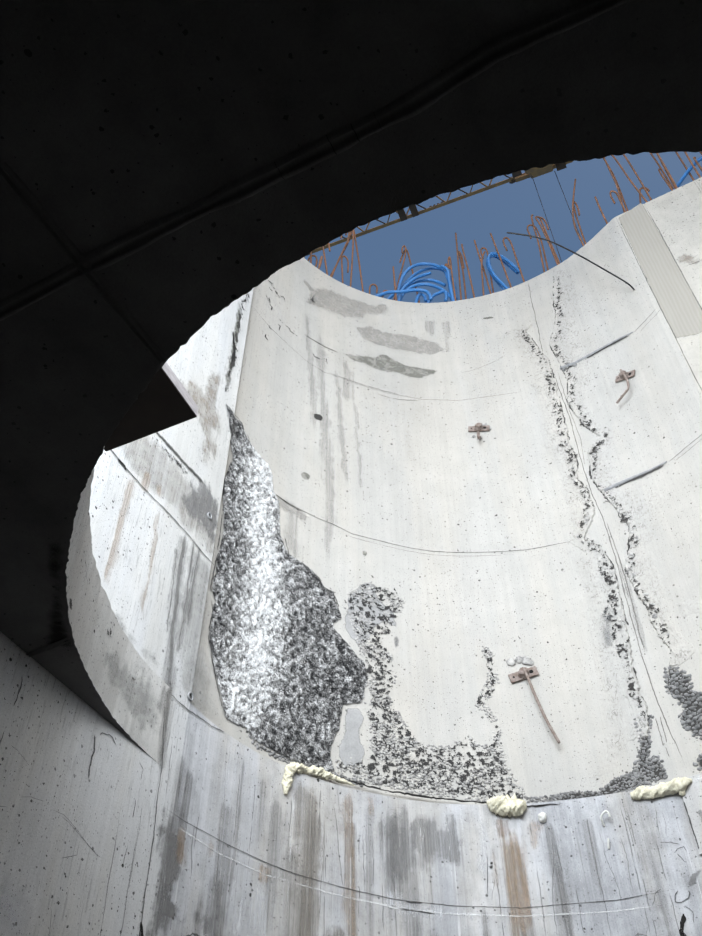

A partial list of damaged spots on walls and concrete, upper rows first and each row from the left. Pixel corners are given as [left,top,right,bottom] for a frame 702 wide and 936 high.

spalling [522,214,671,709]
spalling [208,404,368,772]
damp [148,826,185,936]
damp [292,787,323,936]
damp [392,816,463,879]
crack [678,914,686,936]